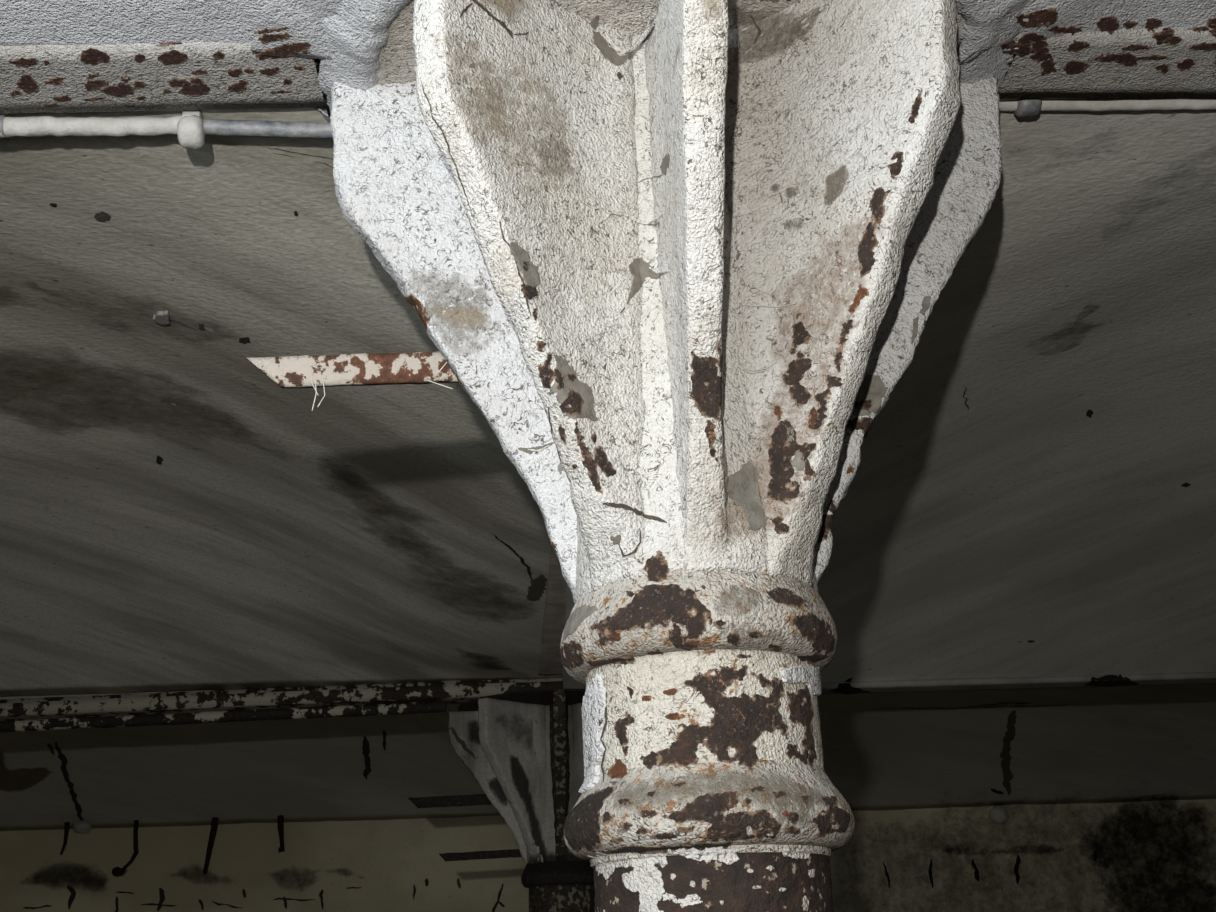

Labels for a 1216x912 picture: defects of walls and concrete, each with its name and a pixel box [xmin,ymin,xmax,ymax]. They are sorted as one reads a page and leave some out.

rust [9,48,147,108]
rust [134,26,311,97]
crack [460,0,528,38]
rust [908,93,922,123]
rust [1001,8,1216,76]
rust [767,151,903,534]
rust [538,352,616,494]
rust [818,500,836,543]
rust [560,550,850,855]